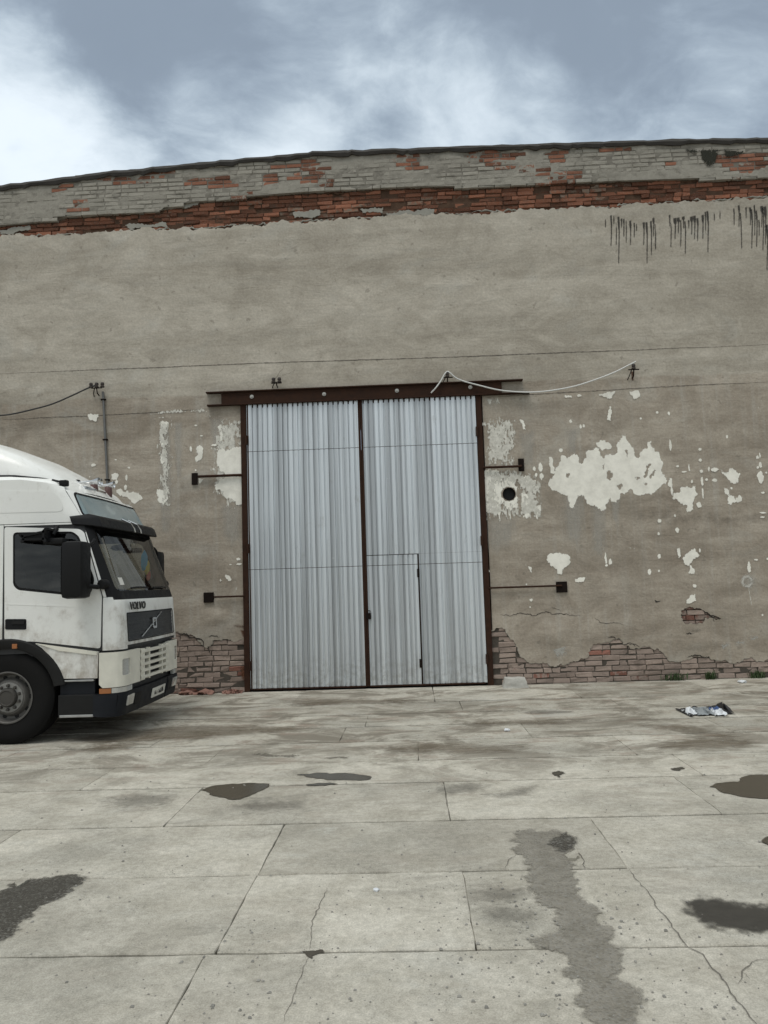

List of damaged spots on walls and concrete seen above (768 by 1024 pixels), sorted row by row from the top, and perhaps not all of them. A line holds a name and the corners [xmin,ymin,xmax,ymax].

flaking render [0,151,768,238]
water stain [605,215,656,263]
water stain [669,211,715,253]
water stain [733,205,768,265]
peeling [151,408,242,508]
peeling [480,418,742,533]
peeling [546,552,571,575]
flaking render [677,548,720,624]
flaking render [171,631,252,694]
flaking render [484,612,768,685]
crack [284,893,325,1018]
crack [630,871,762,1024]